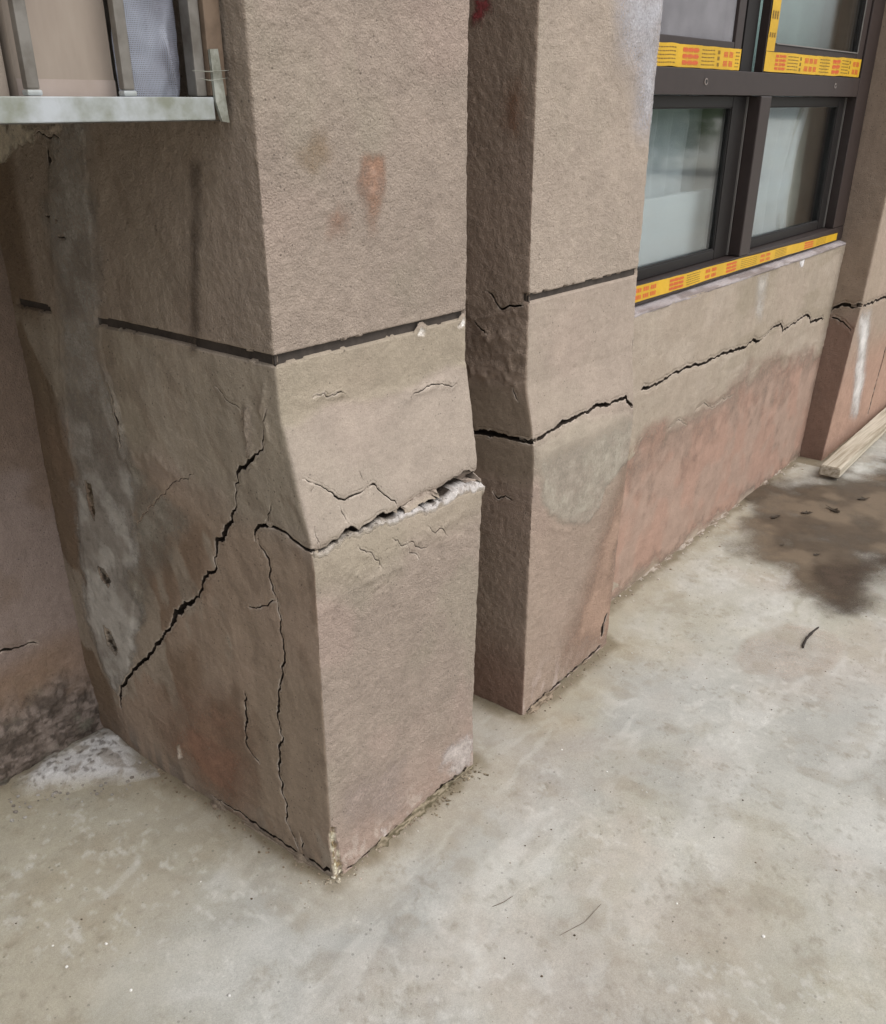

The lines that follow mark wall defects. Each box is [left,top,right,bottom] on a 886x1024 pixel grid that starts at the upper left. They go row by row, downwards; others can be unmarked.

crack [312,388,346,401]
crack [411,380,457,400]
crack [473,289,886,447]
flaking render [309,479,485,559]
leakage [568,351,886,657]
crack [118,407,515,874]